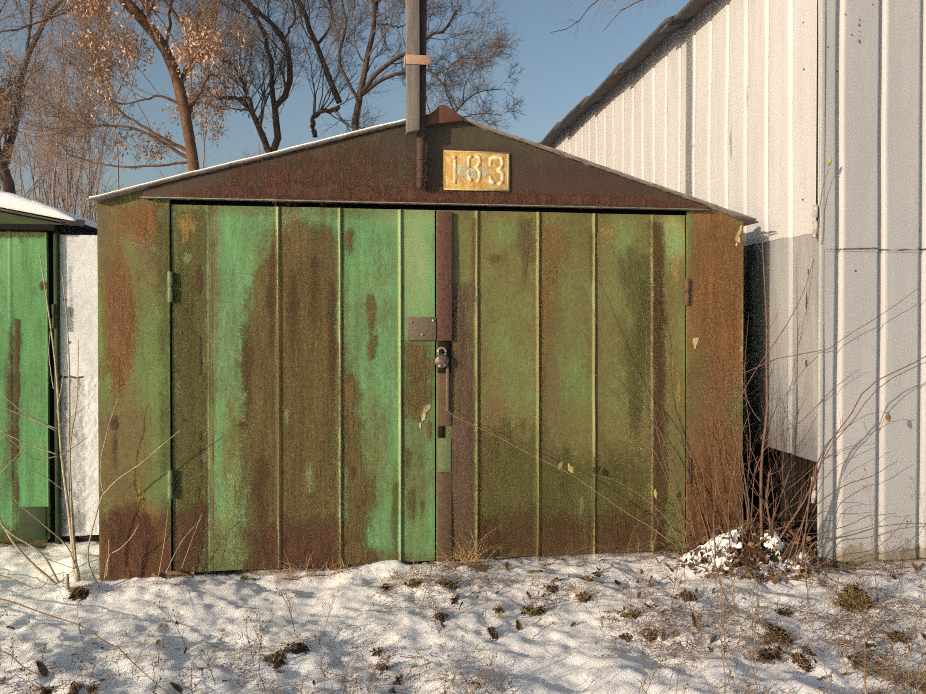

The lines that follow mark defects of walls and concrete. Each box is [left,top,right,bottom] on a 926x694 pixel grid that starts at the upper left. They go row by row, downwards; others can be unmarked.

corrosion [182,143,690,208]
corrosion [7,319,20,462]
corrosion [235,220,383,573]
corrosion [448,218,680,561]
corrosion [99,500,216,582]